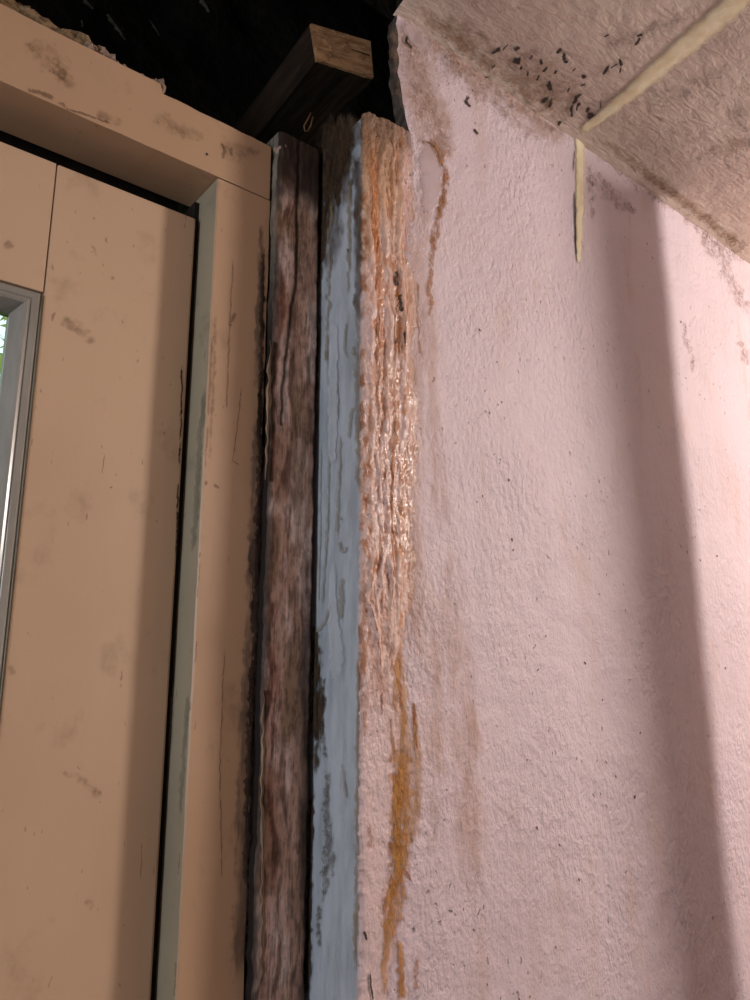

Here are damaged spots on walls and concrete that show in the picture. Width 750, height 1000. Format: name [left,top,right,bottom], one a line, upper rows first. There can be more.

leakage [316,115,361,400]
leakage [417,140,449,314]
leakage [234,236,266,955]
peeling [316,324,355,673]
rust [381,658,422,999]